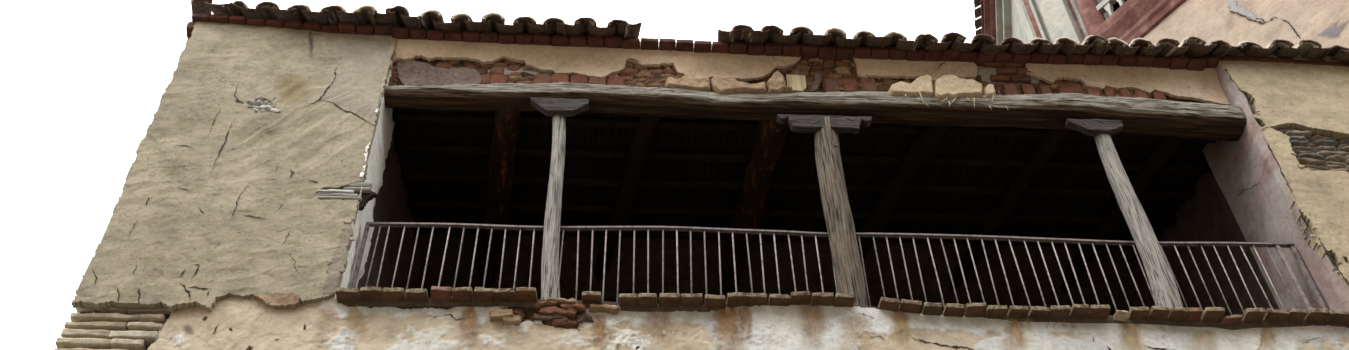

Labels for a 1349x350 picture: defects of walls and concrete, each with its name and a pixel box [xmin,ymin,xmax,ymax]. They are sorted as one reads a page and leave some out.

crack [1230,11,1300,38]
crack [305,68,375,127]
peeling [397,61,509,86]
peeling [532,63,793,95]
peeling [807,56,1166,110]
flaking render [54,312,167,350]